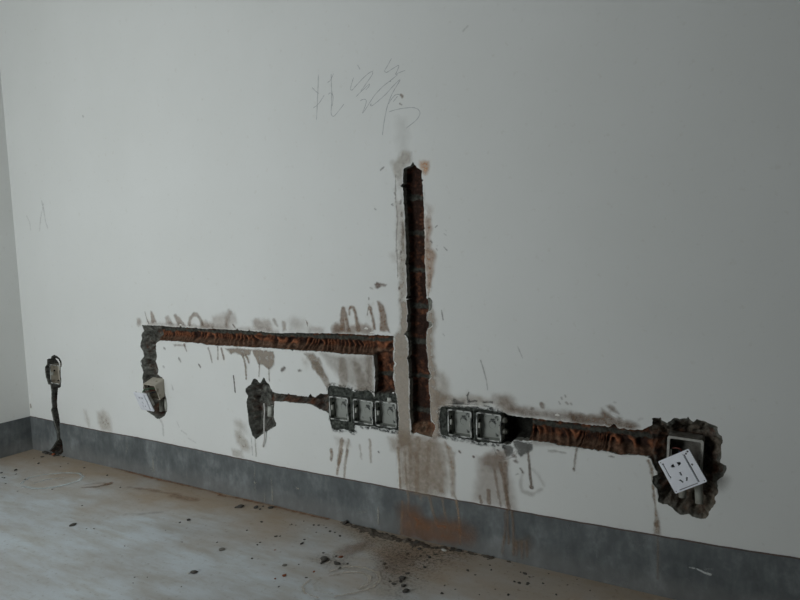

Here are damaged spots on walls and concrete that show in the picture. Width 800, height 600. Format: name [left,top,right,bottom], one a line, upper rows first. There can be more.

water stain [335,302,389,332]
hole [649,417,727,519]